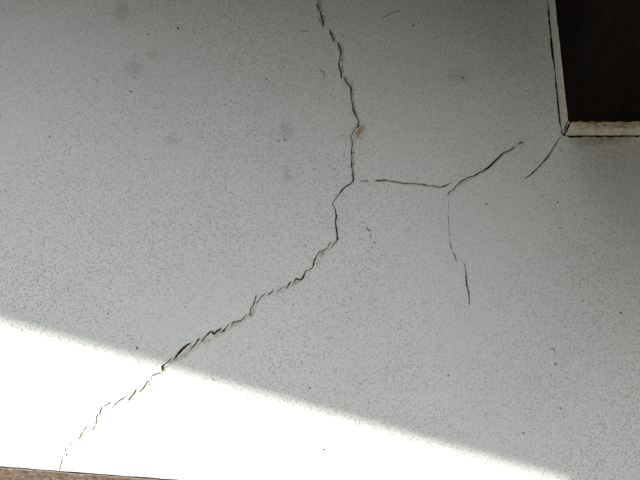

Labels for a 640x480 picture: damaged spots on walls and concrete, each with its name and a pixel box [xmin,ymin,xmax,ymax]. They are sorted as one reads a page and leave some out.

crack [59,0,524,470]
crack [526,0,640,178]